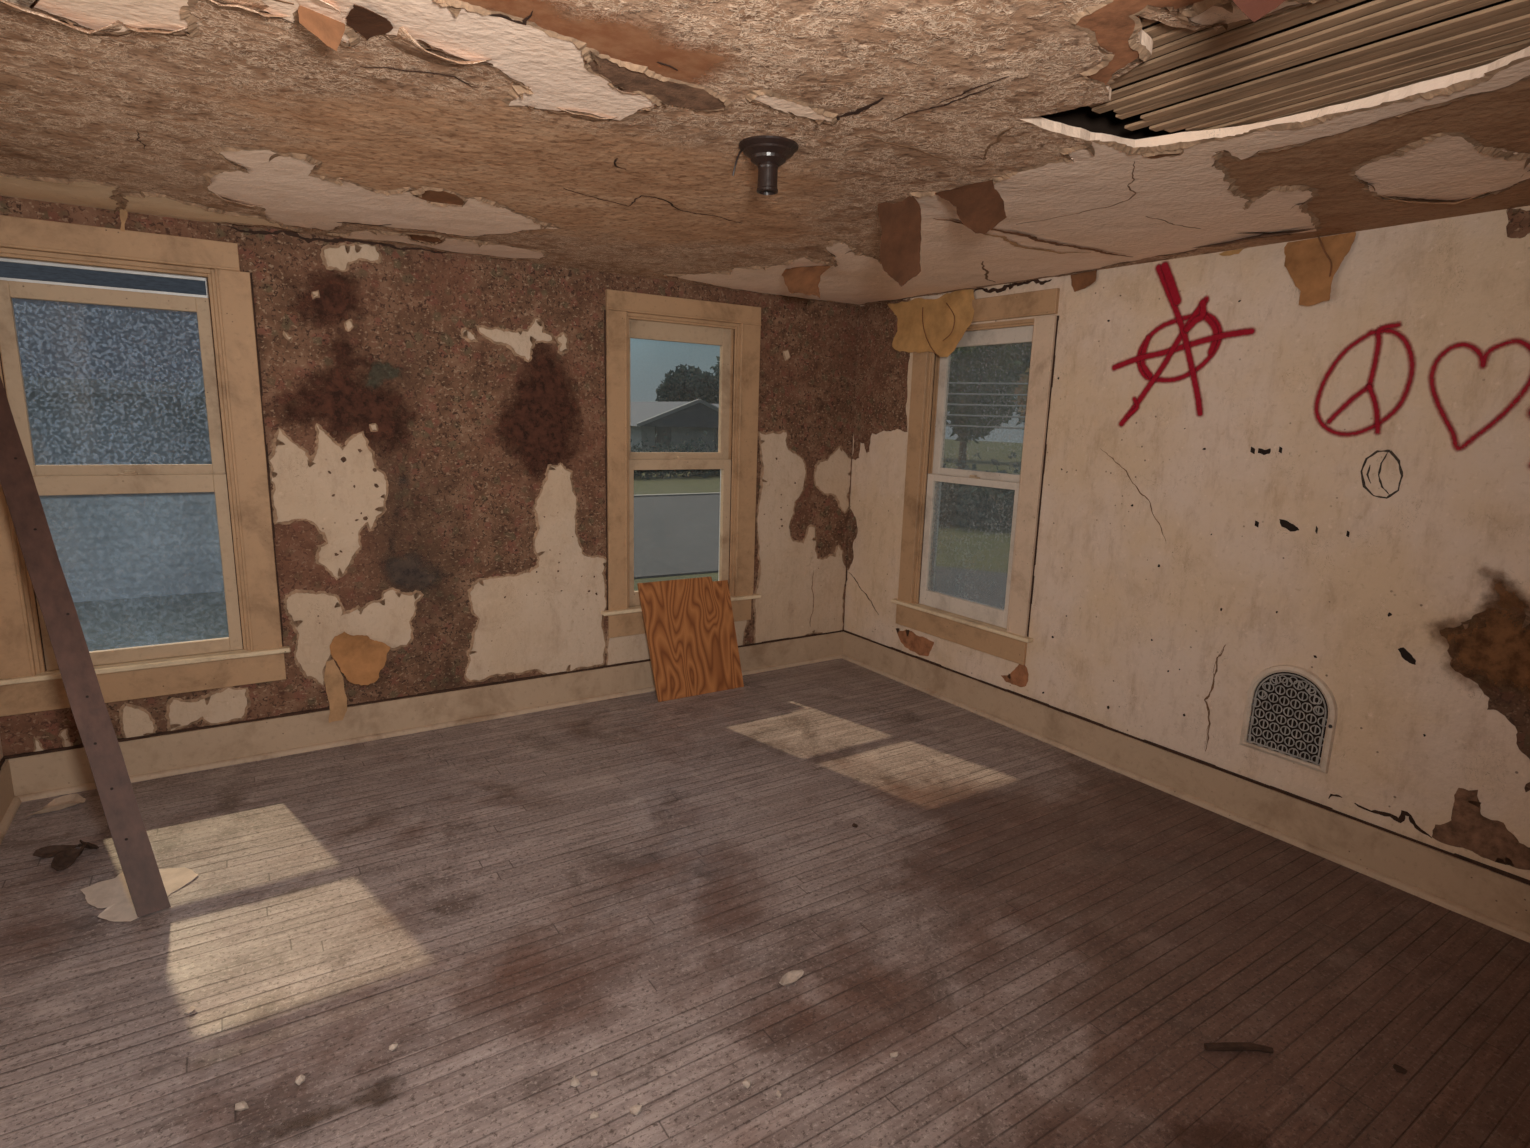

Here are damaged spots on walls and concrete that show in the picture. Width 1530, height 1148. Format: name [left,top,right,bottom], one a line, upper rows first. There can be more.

peeling [219,0,838,125]
peeling [0,146,561,272]
crack [564,158,740,223]
crack [933,162,1200,293]
leakage [295,275,362,327]
peeling [663,0,1530,646]
leakage [287,341,415,450]
leakage [498,342,580,476]
peeling [268,423,424,723]
peeling [464,462,650,682]
leakage [1437,572,1530,693]
crack [1204,645,1225,751]